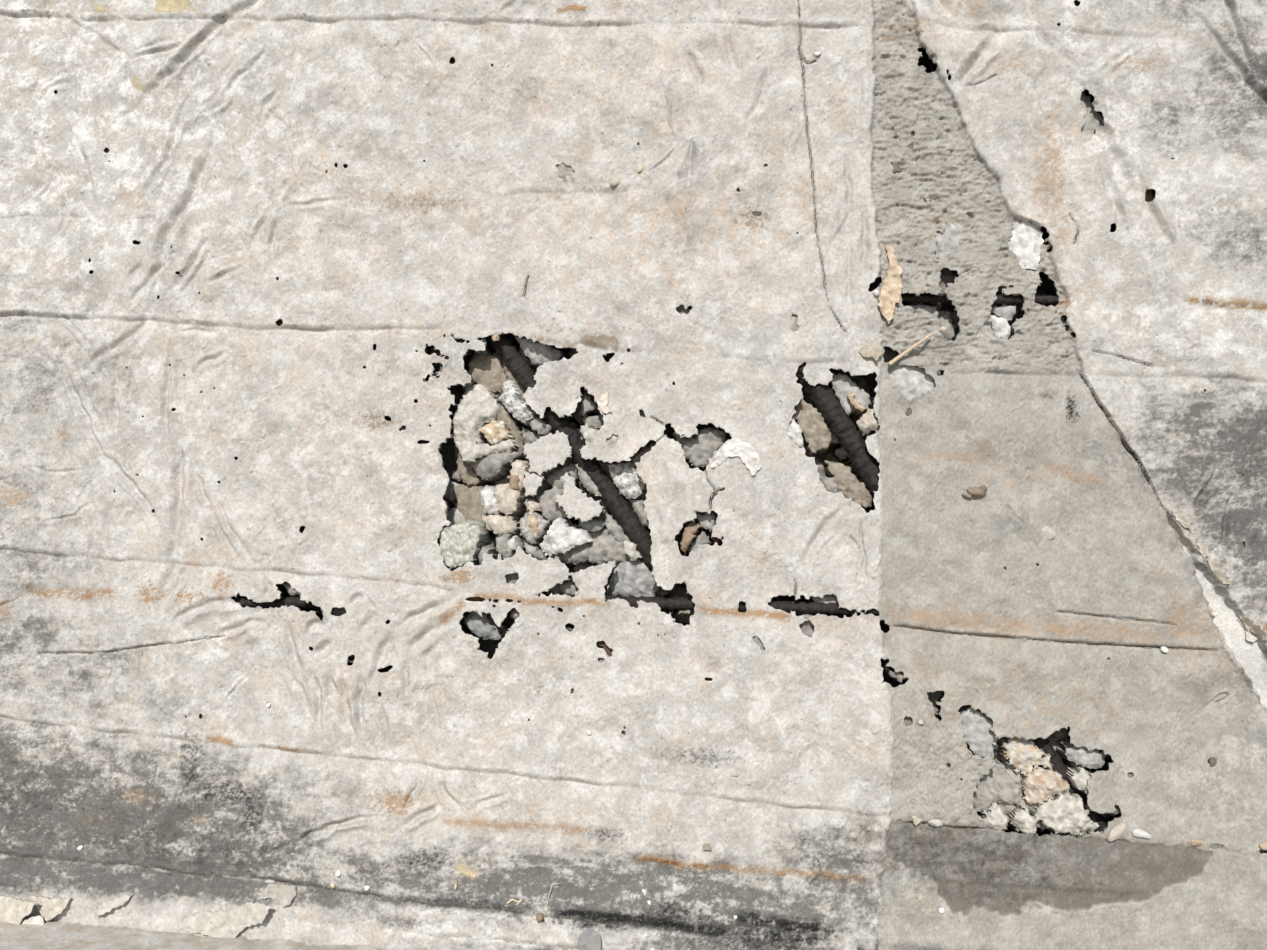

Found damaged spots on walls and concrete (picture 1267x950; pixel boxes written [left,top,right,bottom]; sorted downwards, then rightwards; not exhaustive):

crack [798,0,847,332]
spalling [1007,221,1044,271]
spalling [990,285,1076,340]
spalling [787,344,936,513]
crack [1079,352,1164,508]
spalling [415,333,762,625]
spalling [231,582,335,619]
spalling [462,597,520,658]
spalling [768,594,879,636]
crack [889,611,1217,651]
spalling [958,705,1122,837]
leakage [860,819,1208,915]